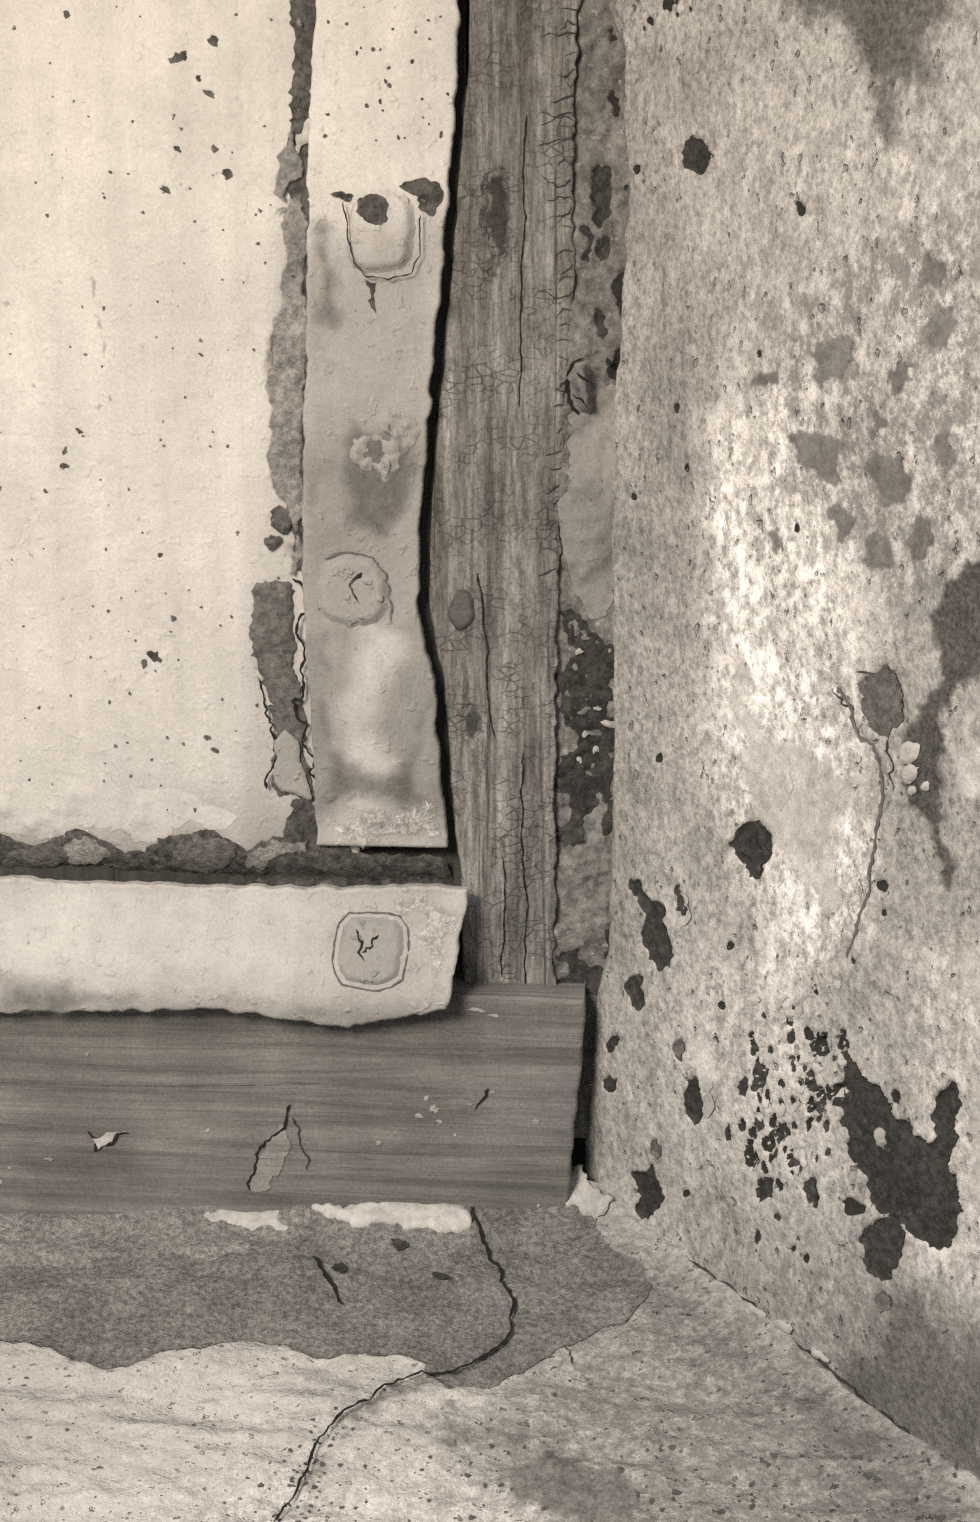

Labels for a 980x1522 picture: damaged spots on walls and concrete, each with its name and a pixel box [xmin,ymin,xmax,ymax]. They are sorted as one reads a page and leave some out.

peeling [168,51,187,63]
water stain [799,0,947,144]
peeling [211,144,233,180]
peeling [0,177,457,1004]
peeling [554,608,615,847]
crack [832,671,894,959]
water stain [689,1034,721,1094]
peeling [94,1131,125,1149]
spalling [631,1139,664,1219]
peeling [0,1164,653,1389]
crack [274,1207,516,1522]